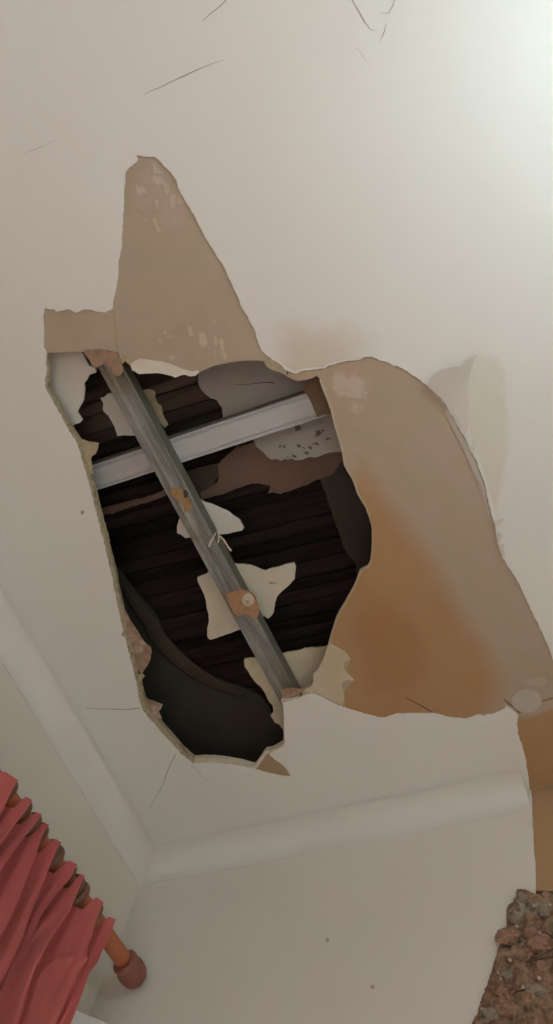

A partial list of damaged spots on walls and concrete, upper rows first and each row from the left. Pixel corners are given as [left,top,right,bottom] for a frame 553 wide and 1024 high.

crack [145,60,222,94]
crack [352,0,395,64]
spalling [277,425,332,460]
peeling [428,354,477,451]
water stain [468,350,513,515]
spalling [45,353,301,768]
water stain [331,450,553,789]
spalling [472,889,553,1024]